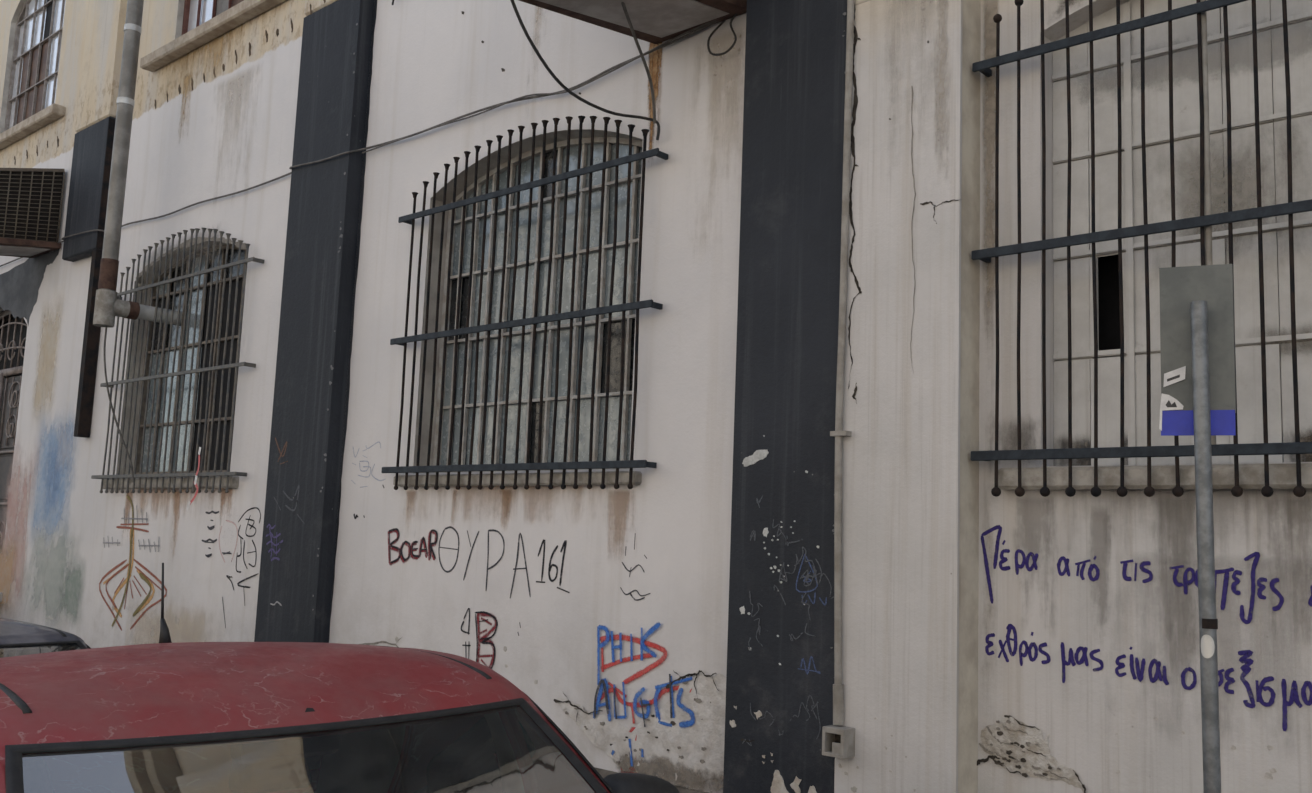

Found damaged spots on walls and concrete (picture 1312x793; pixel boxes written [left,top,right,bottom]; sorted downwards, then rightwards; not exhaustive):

rust [648,42,662,150]
crack [848,4,862,404]
crack [910,86,958,372]
crack [361,637,402,647]
flaking render [556,670,737,785]
peeling [762,754,817,793]
flaking render [979,715,1087,793]